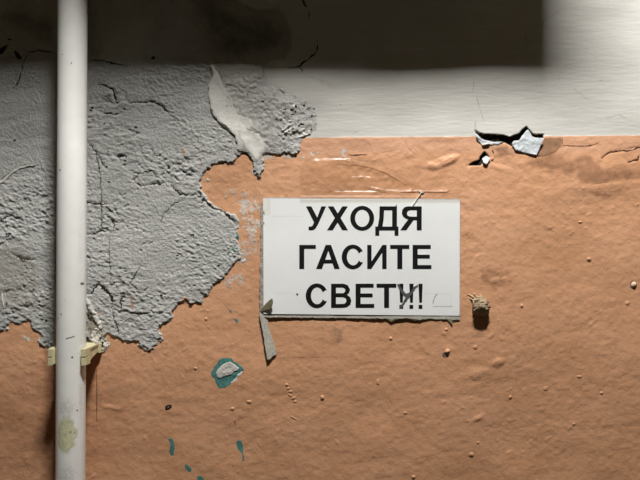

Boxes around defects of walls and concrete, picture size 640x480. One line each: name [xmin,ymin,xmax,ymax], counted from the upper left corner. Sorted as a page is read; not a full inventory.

crack [293,40,318,72]
crack [97,84,175,121]
peeling [469,127,561,166]
crack [562,137,640,162]
spalling [0,0,57,348]
spalling [86,0,319,353]
crack [87,144,237,334]
spalling [211,358,244,388]